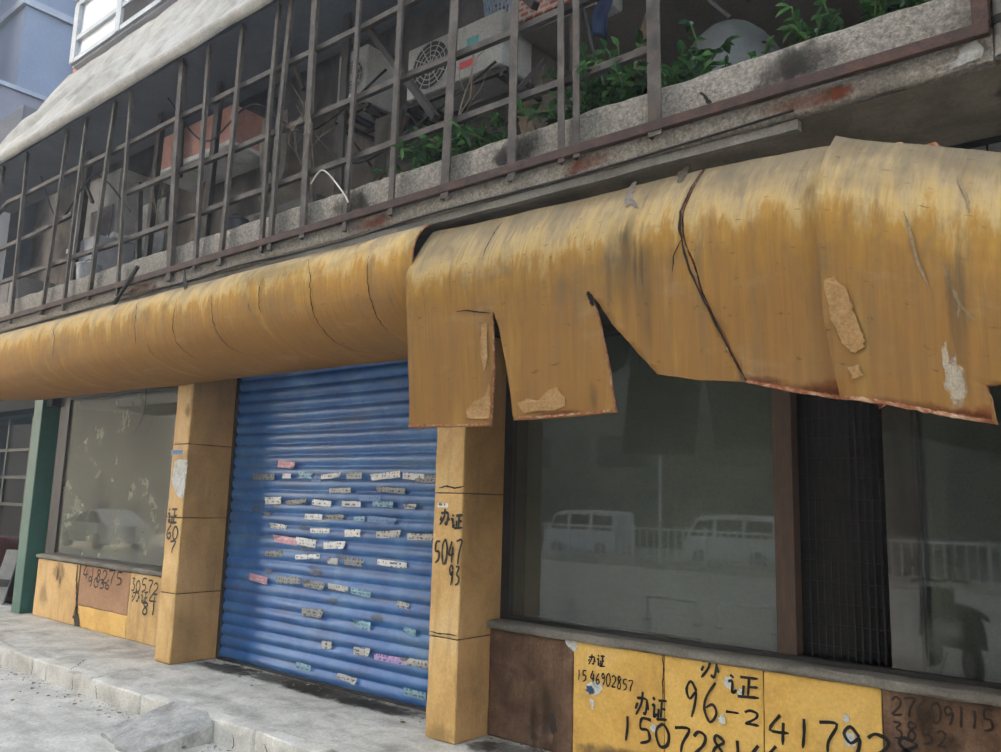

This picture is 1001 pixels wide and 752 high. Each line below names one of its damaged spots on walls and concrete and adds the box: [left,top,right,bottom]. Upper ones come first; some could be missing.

crack [134,301,198,360]
crack [309,271,367,353]
crack [367,256,387,330]
crack [672,170,743,379]
peeling [824,277,865,379]
peeling [517,387,565,413]
peeling [172,459,188,498]
crack [71,565,79,615]